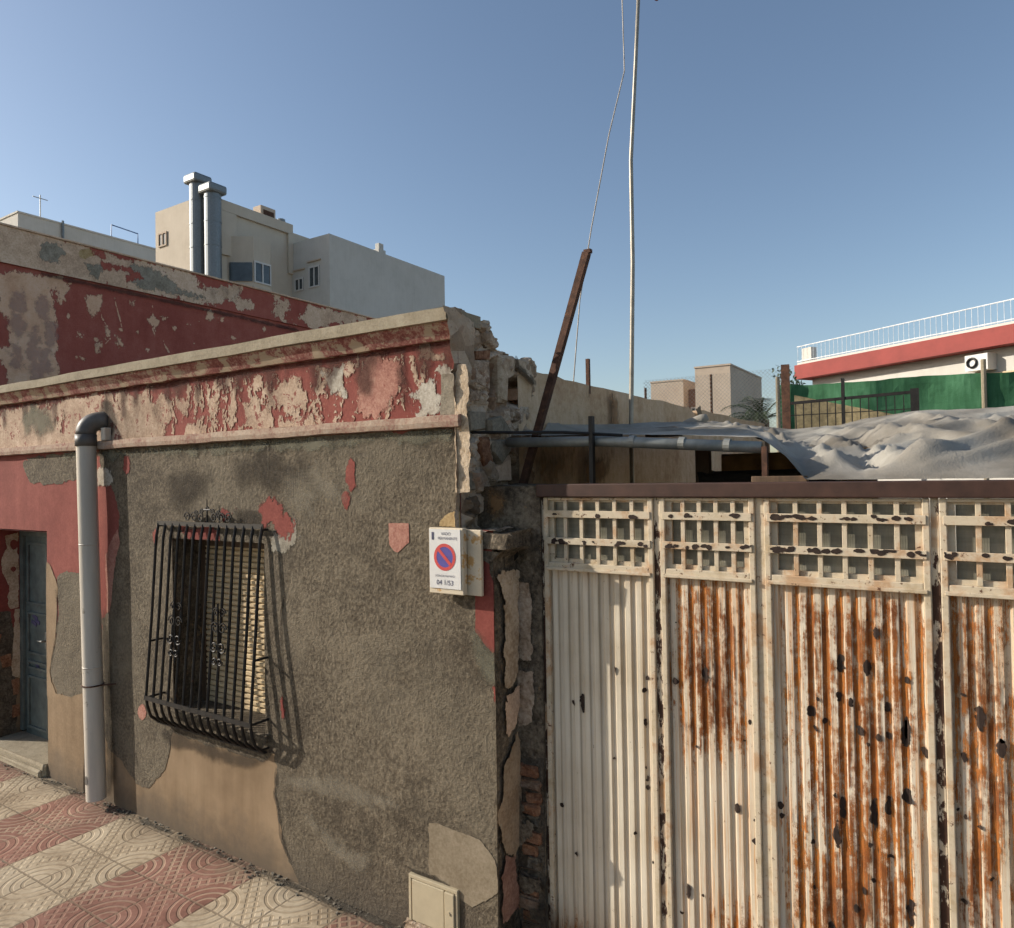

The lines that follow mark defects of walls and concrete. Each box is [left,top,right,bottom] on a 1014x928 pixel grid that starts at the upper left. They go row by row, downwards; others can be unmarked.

peeling [0,225,255,384]
peeling [271,293,367,329]
flaking render [0,305,537,928]
flaking render [518,755,546,928]
corrosion [668,579,752,776]
corrosion [686,884,754,928]
corrosion [778,586,1014,928]